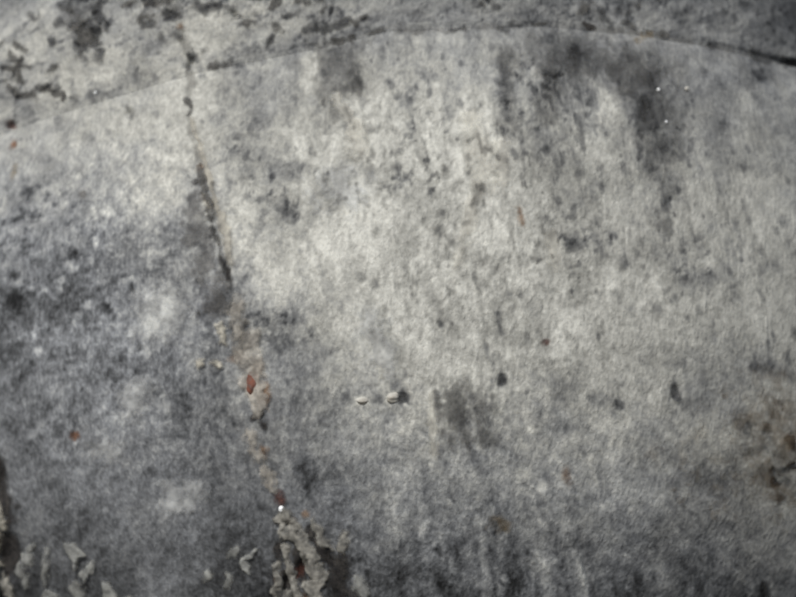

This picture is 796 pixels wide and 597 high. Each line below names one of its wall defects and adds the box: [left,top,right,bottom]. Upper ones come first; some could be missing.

crack [497,22,546,30]
crack [582,21,596,30]
crack [750,47,796,68]
crack [183,98,232,281]
spalling [183,180,370,597]
spalling [0,459,57,597]
peeling [63,543,94,597]
peeling [101,583,117,597]